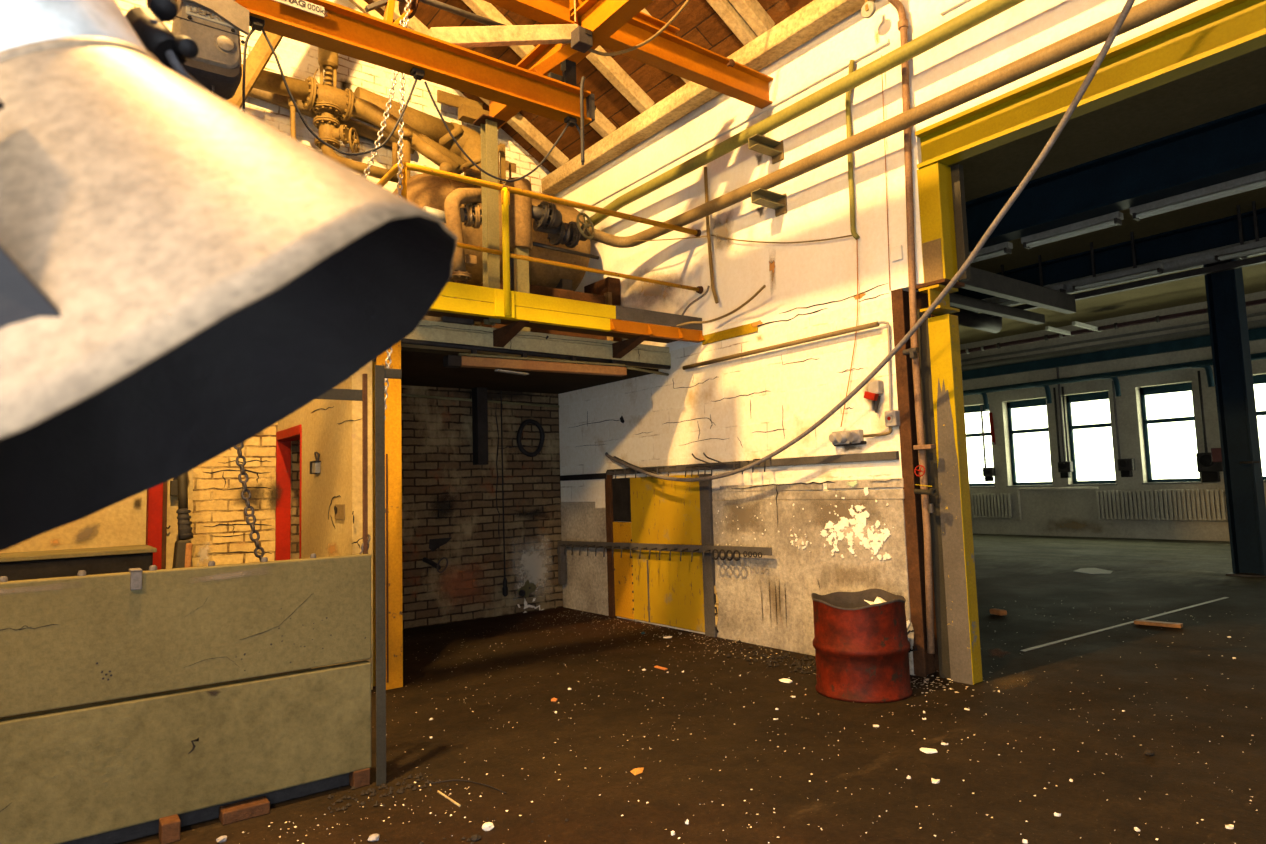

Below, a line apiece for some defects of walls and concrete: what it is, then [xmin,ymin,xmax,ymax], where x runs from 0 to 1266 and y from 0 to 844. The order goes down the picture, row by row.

peeling [716,487,894,560]
crack [0,623,57,631]